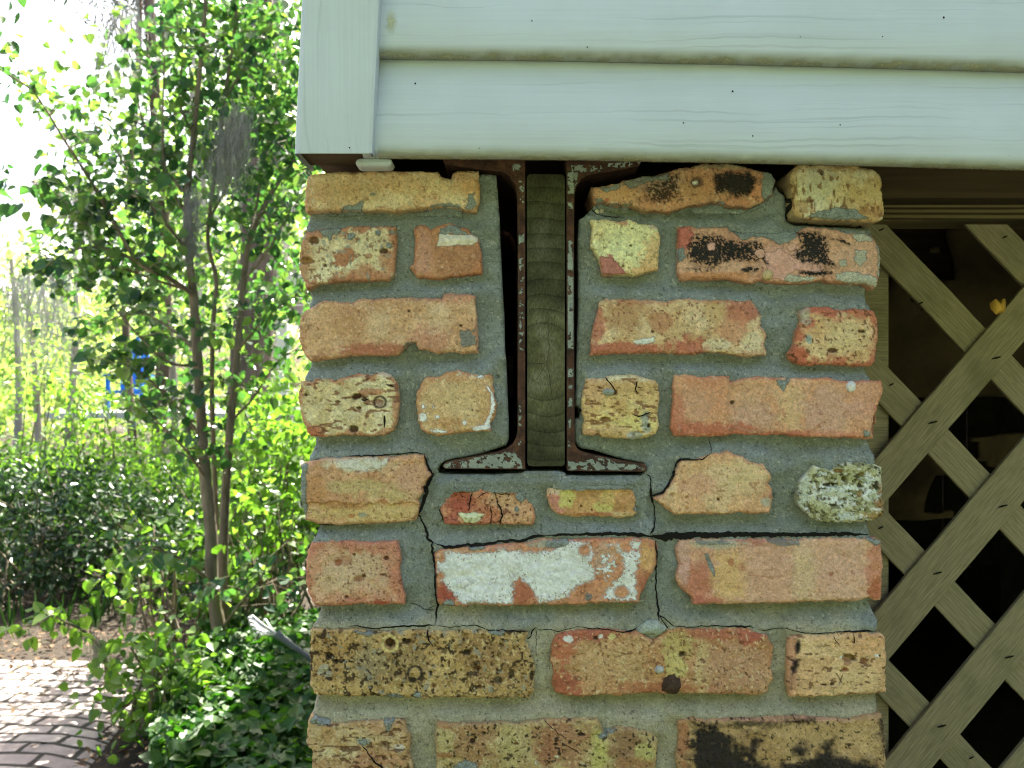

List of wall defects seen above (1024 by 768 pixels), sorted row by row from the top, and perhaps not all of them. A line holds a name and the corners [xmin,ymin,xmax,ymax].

crack [346,439,873,655]